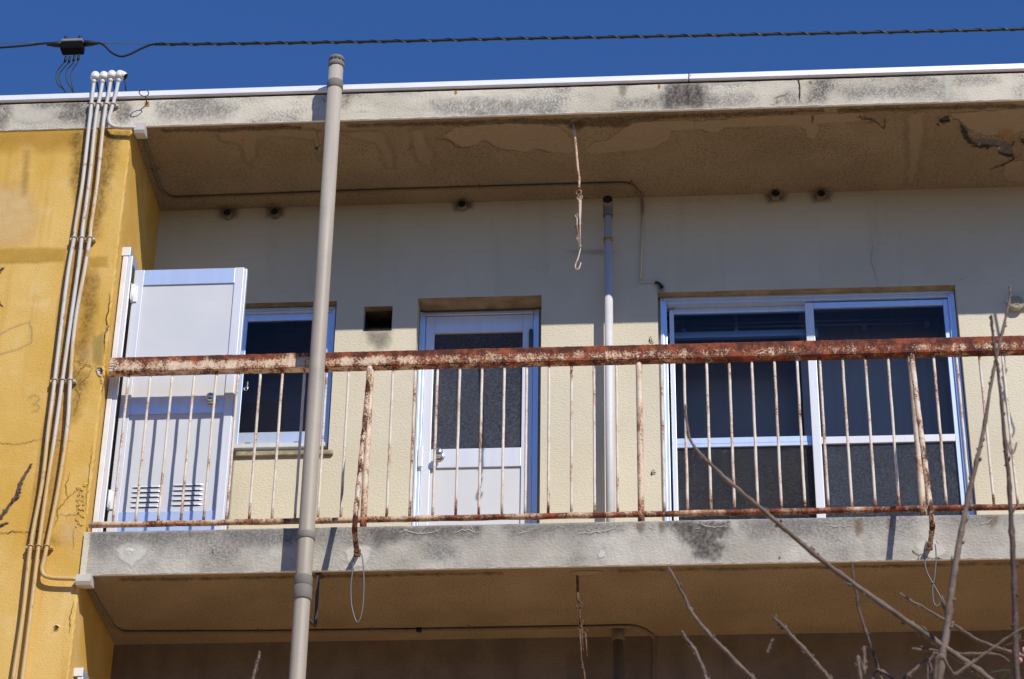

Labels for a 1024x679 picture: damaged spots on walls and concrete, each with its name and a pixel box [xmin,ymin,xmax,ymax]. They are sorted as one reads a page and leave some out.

leakage [160,102,301,132]
leakage [348,81,828,131]
peeling [444,112,864,154]
leakage [839,85,1023,113]
peeling [936,108,1024,182]
leakage [671,521,737,571]